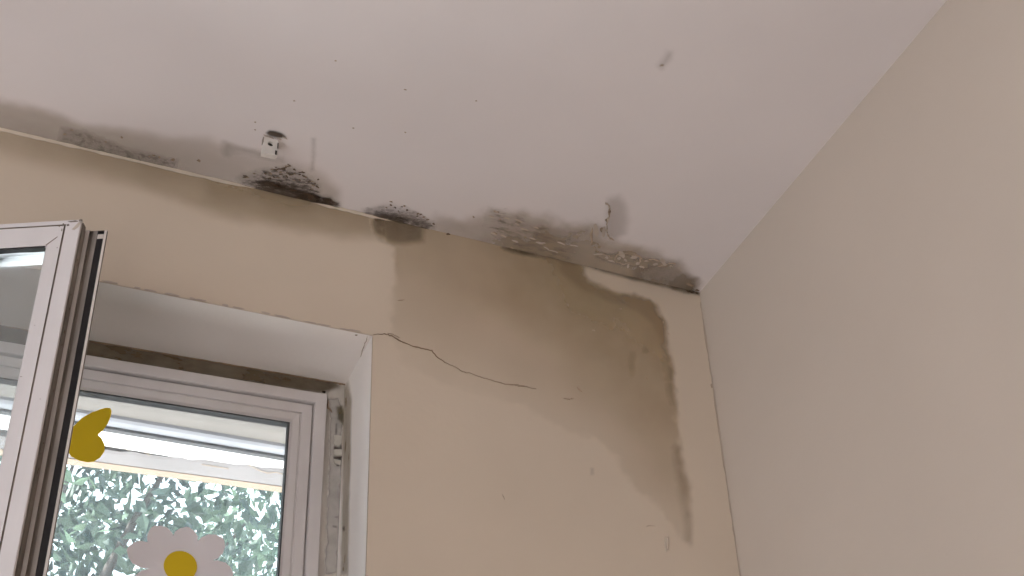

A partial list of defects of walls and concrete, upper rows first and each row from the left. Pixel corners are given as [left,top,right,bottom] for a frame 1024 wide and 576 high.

damp [210,164,338,209]
damp [374,201,435,227]
damp [487,229,699,379]
crack [360,333,536,389]